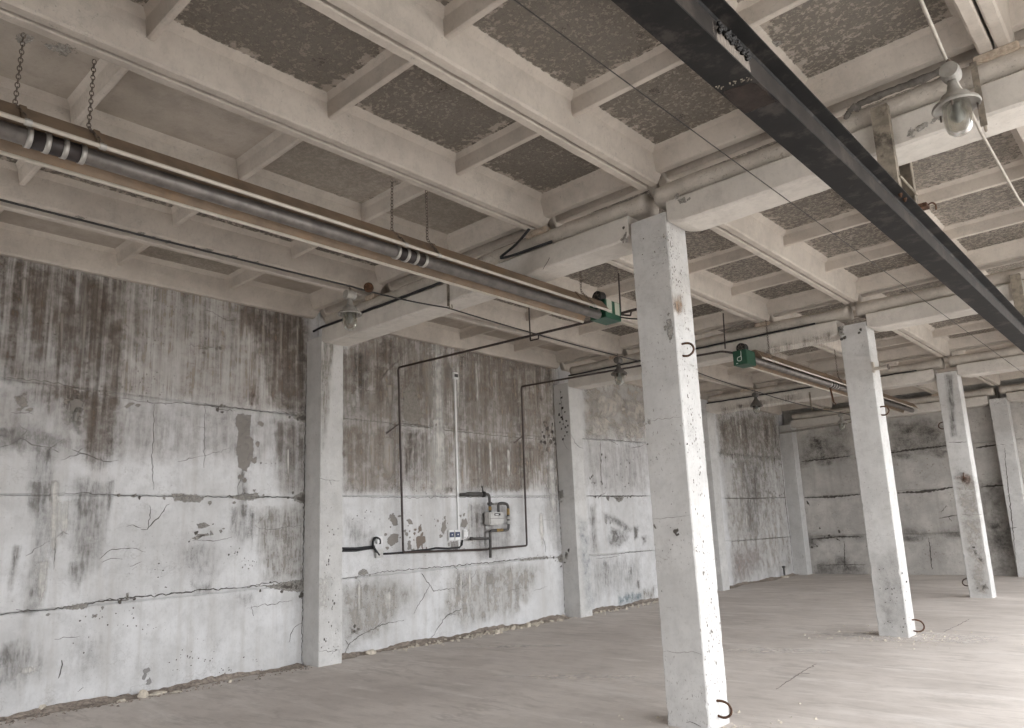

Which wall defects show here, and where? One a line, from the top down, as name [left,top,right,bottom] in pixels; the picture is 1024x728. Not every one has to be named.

leakage [0,255,304,452]
leakage [31,481,111,556]
spalling [188,522,225,542]
peeling [230,414,276,504]
leakage [242,511,302,575]
crack [0,340,679,662]
peeling [384,513,427,550]
leakage [322,338,569,538]
peeling [434,516,465,549]
leakage [720,416,790,576]
crack [891,442,1016,557]